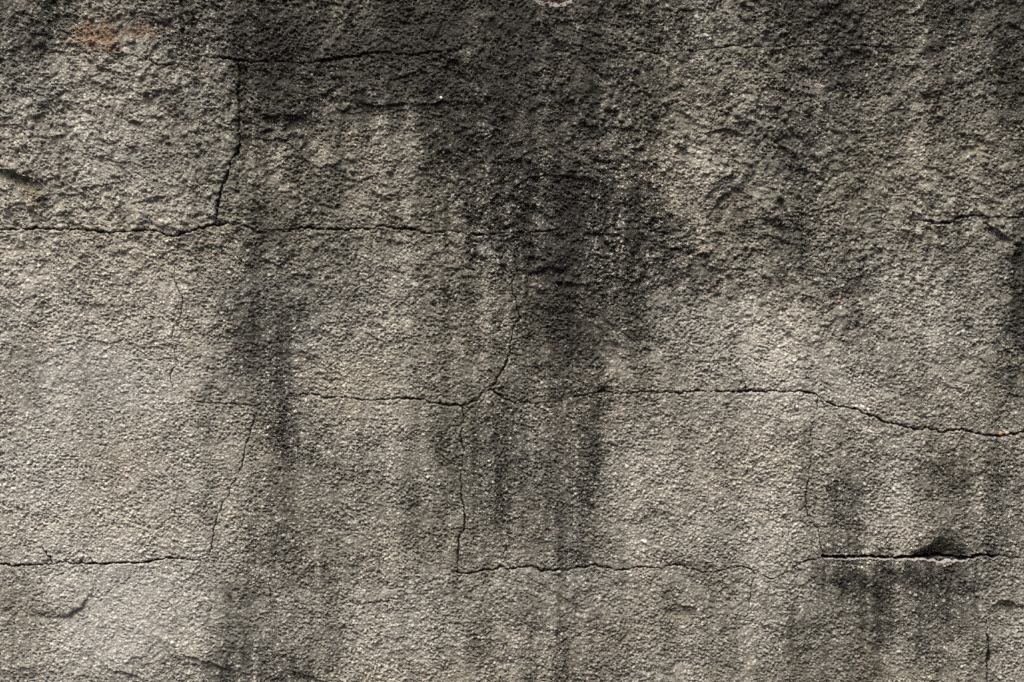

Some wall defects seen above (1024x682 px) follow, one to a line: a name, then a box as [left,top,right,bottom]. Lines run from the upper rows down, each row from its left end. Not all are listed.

crack [638,44,921,55]
crack [0,26,579,238]
water stain [179,0,626,433]
crack [910,214,1024,225]
crack [170,268,183,388]
crack [0,401,266,567]
crack [285,249,1024,621]
water stain [821,532,971,611]
crack [984,619,992,682]